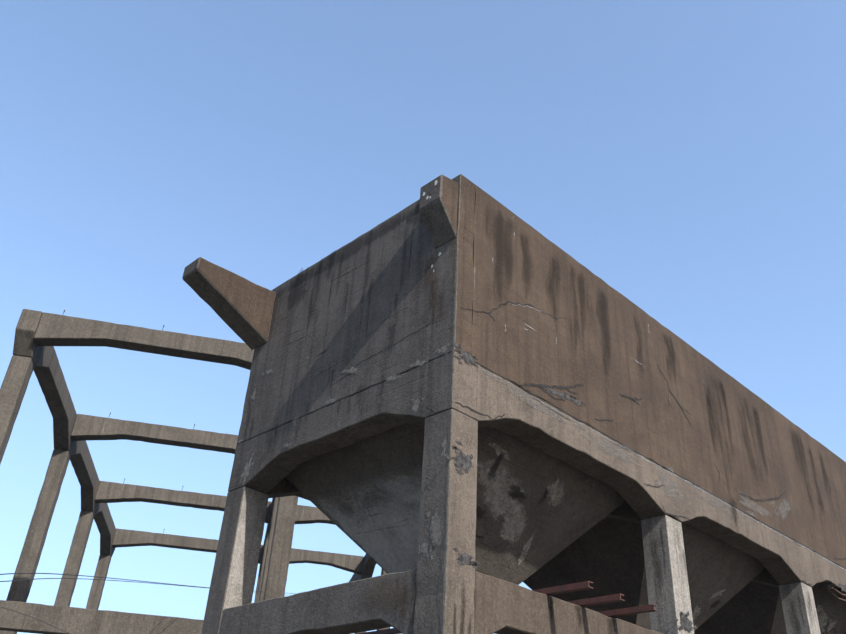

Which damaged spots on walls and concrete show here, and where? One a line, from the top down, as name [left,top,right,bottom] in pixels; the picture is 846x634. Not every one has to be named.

crack [237,301,566,444]
peeling [441,434,534,568]